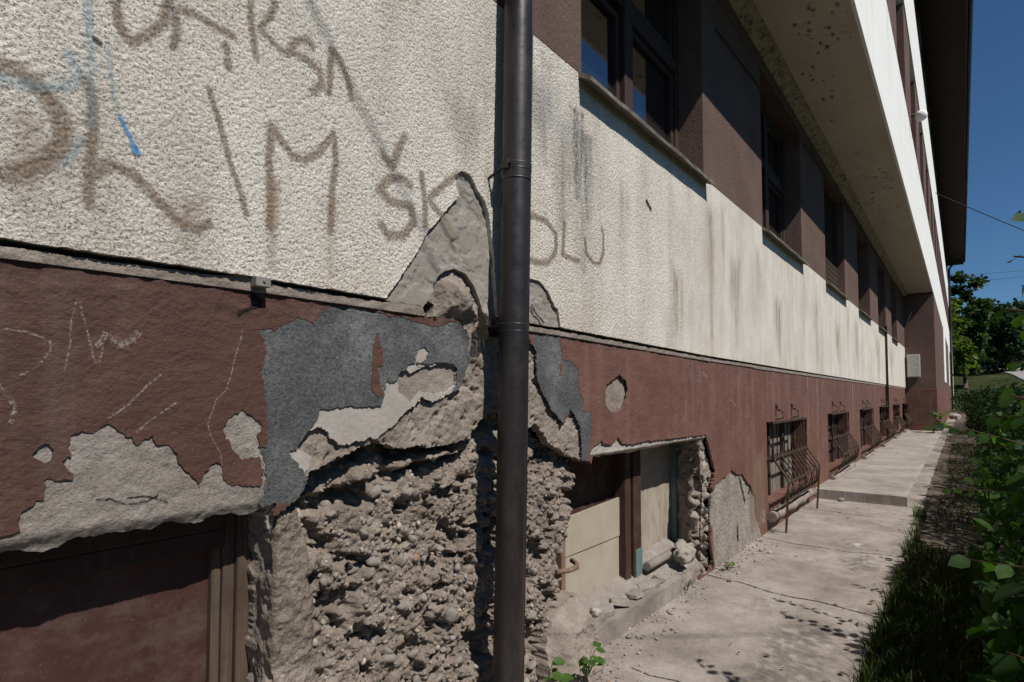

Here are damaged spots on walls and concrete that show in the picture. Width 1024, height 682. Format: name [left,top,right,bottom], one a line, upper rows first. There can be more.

spalling [0,305,499,682]
spalling [524,334,771,682]